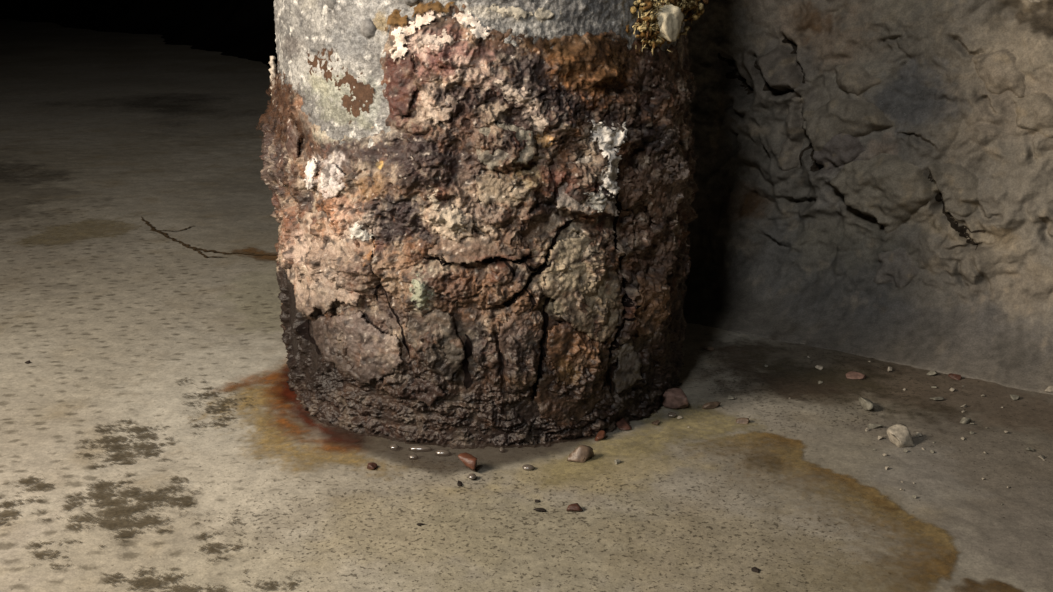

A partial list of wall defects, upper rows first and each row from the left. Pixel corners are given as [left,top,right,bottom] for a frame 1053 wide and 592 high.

crack [141,216,277,258]
crack [369,226,409,361]
rust [225,1,750,484]
crack [422,219,575,401]
water stain [583,120,628,212]
crack [606,193,641,396]
crack [928,174,986,250]
water stain [176,377,253,435]
water stain [0,418,245,569]
water stain [720,431,958,590]
water stain [102,566,226,592]
water stain [959,578,1022,592]